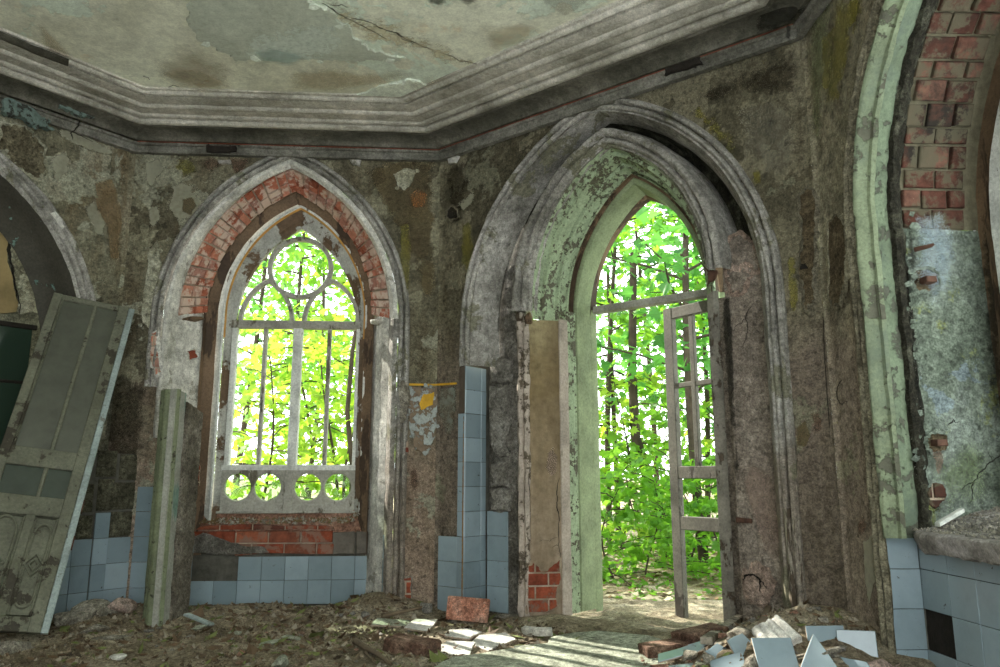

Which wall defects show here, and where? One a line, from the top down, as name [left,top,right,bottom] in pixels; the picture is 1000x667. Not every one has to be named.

peeling [186,0,472,64]
crack [322,3,476,64]
peeling [357,78,426,97]
flaking render [0,98,70,184]
flaking render [86,179,121,259]
peeling [170,183,202,221]
flaking render [178,169,389,318]
flaking render [900,0,1000,382]
peeling [406,383,440,456]
flaking render [75,450,137,539]
crack [962,452,1000,502]
crack [743,574,767,591]